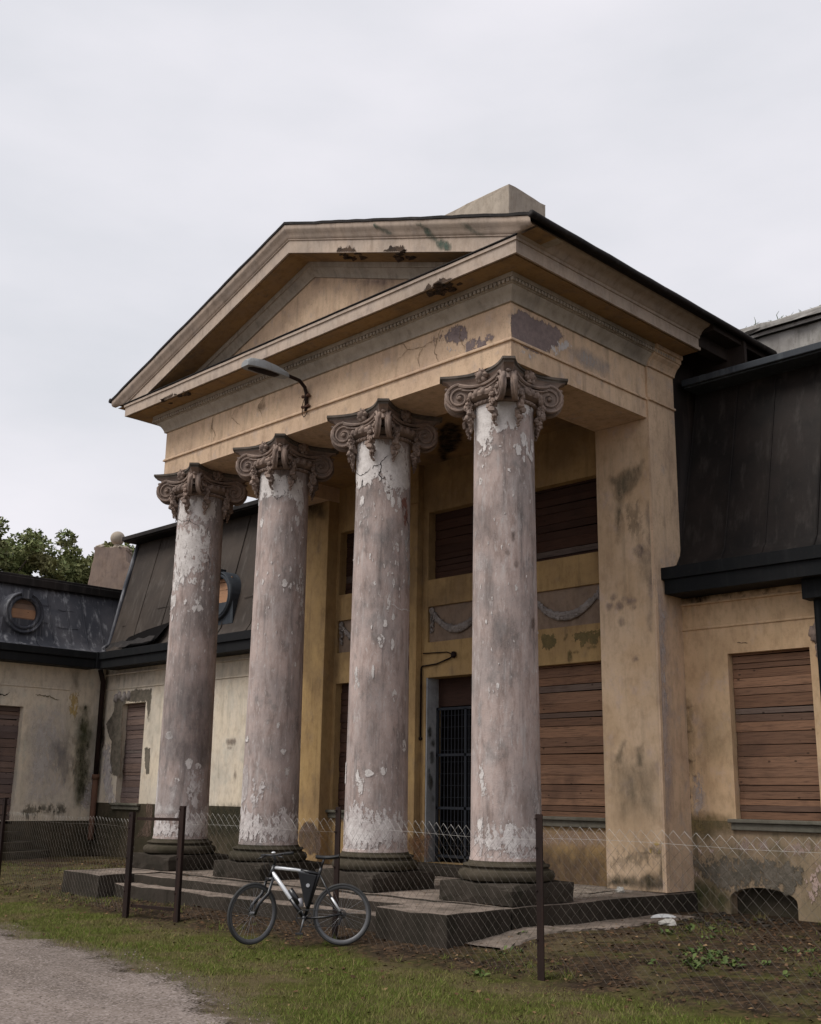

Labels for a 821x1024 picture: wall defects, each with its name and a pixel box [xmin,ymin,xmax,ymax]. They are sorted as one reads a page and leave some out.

peeling [433,324,494,352]
peeling [511,309,595,366]
peeling [170,497,217,621]
peeling [258,473,304,543]
crack [356,456,387,487]
peeling [355,439,410,650]
peeling [438,402,533,485]
flaking render [102,688,152,803]
peeling [138,748,209,837]
peeling [239,768,321,855]
peeling [343,761,407,850]